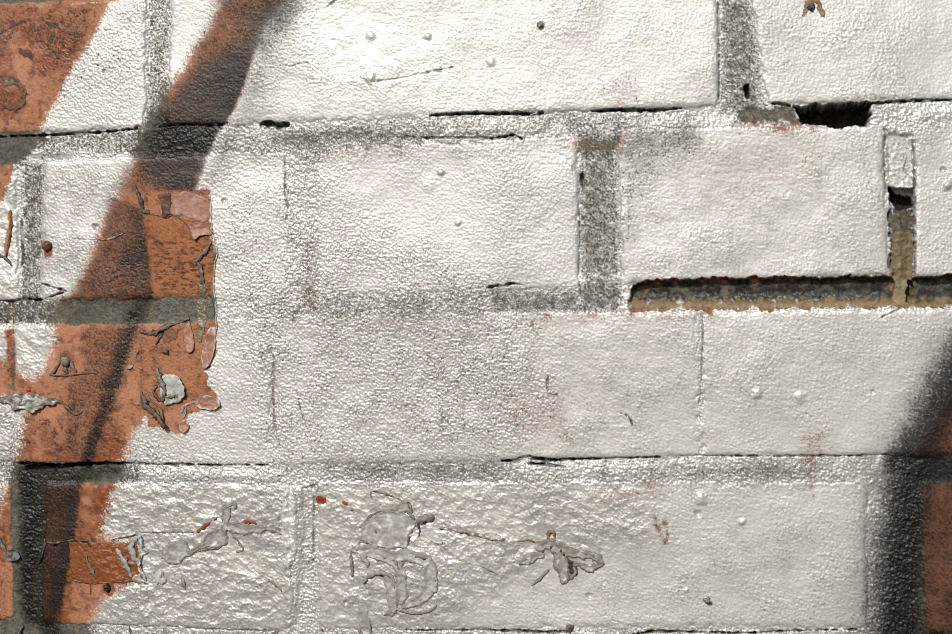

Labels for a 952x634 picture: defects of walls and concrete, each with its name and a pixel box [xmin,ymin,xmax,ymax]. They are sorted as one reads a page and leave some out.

peeling [1,75,27,112]
peeling [127,185,220,434]
peeling [0,538,20,561]
peeling [36,531,148,595]